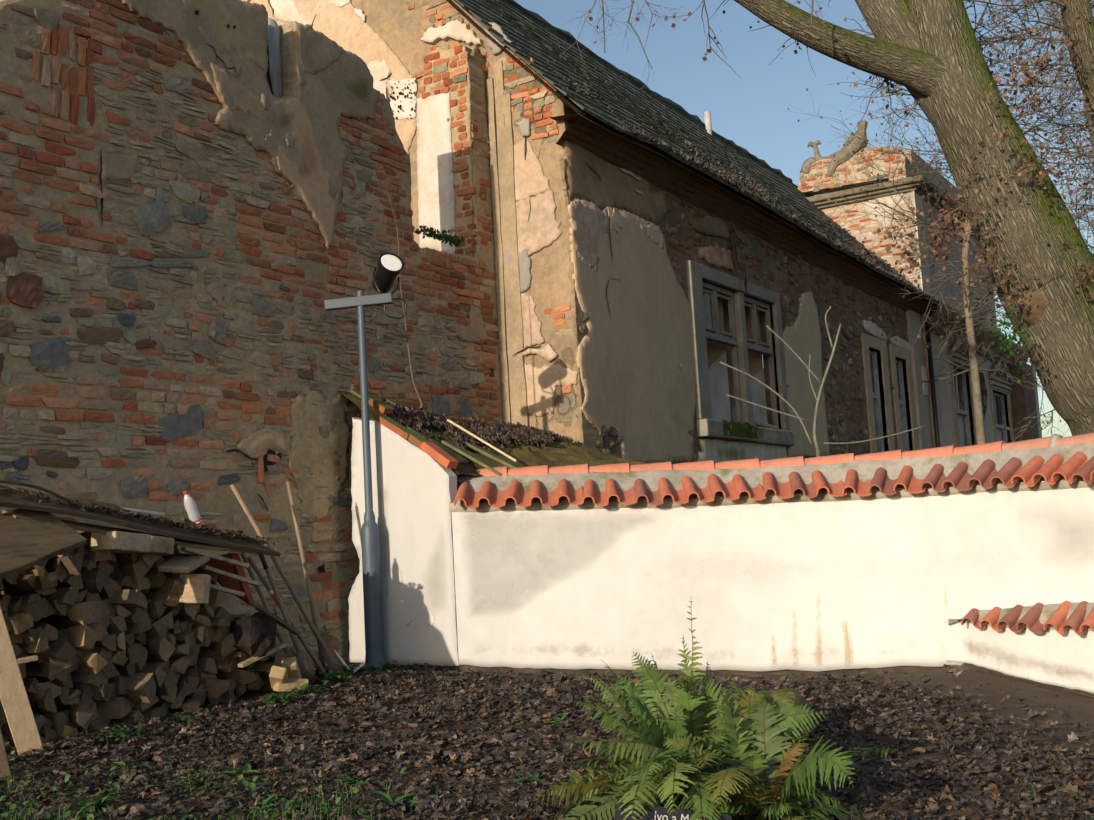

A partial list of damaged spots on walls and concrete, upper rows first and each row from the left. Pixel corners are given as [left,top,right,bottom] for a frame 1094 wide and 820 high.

crack [96,149,104,227]
flaking render [120,0,418,249]
flaking render [420,19,911,464]